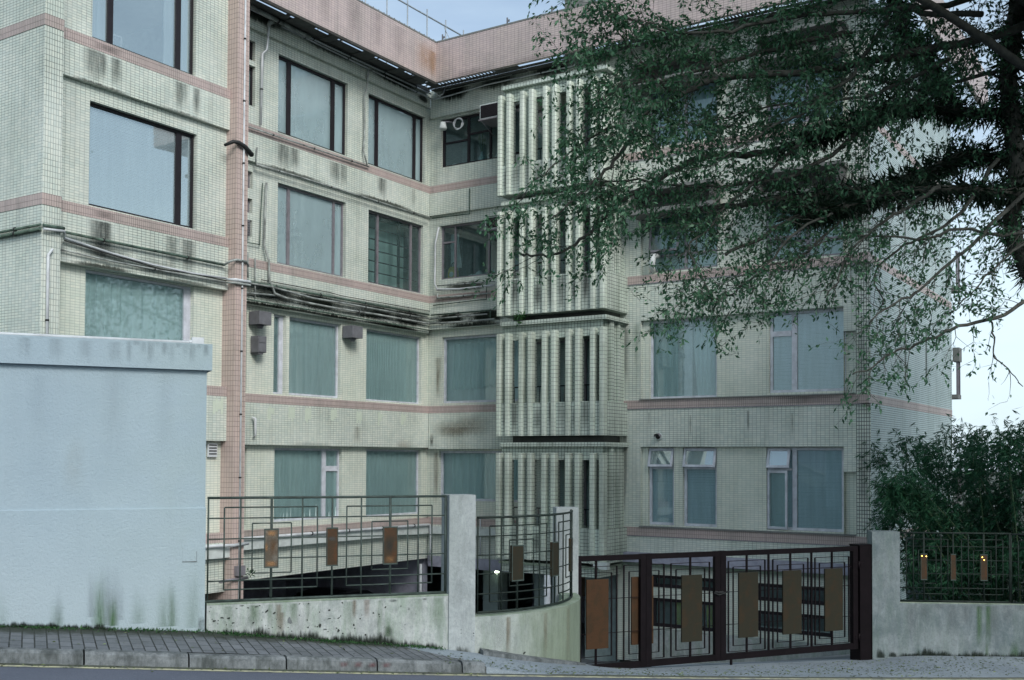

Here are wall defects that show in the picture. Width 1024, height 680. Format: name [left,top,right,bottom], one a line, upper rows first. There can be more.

damp [2,610,114,629]